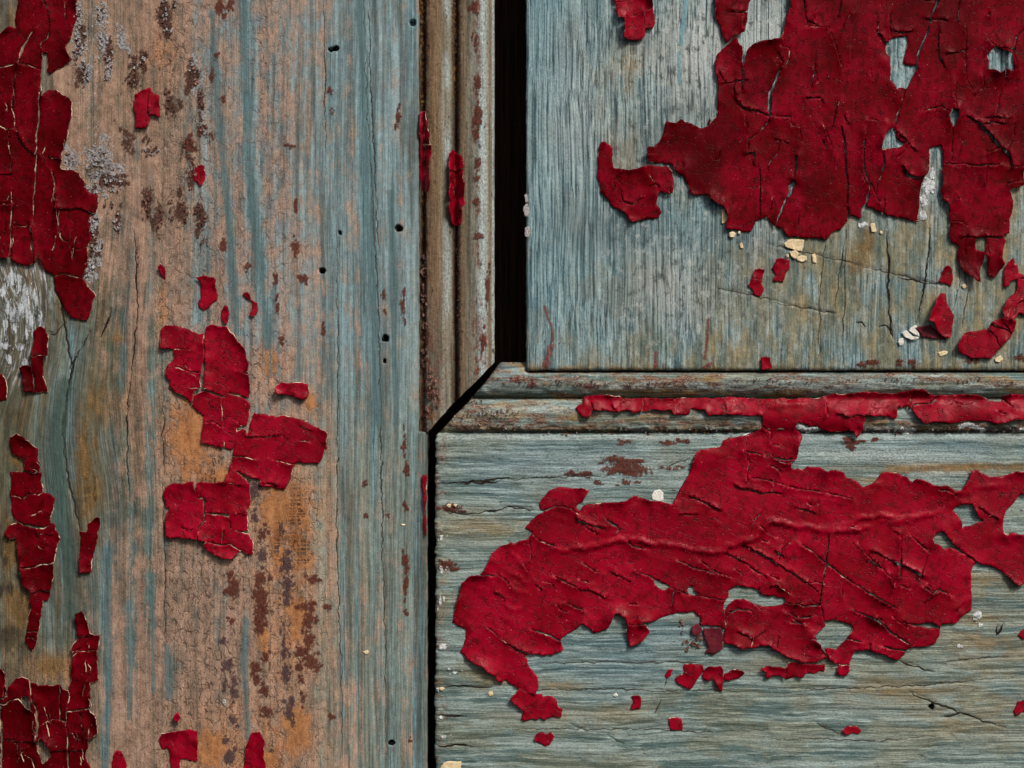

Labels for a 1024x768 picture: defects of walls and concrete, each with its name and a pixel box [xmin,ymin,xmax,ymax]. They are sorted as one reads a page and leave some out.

peeling [0,0,123,321]
peeling [418,95,432,192]
peeling [597,0,1024,362]
crack [718,226,969,362]
peeling [160,275,328,559]
peeling [4,433,60,651]
peeling [78,517,100,574]
peeling [452,376,1024,746]
peeling [0,610,100,768]
crack [436,741,474,749]
crack [436,624,1015,744]